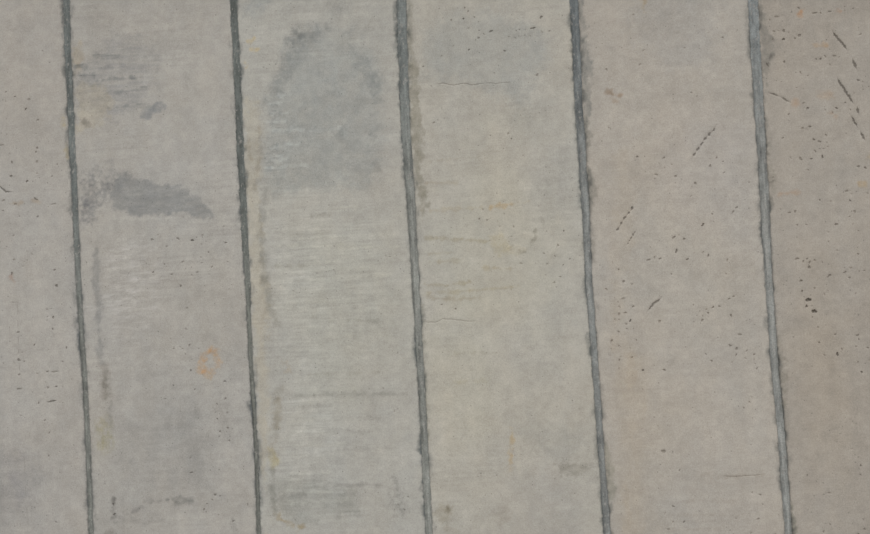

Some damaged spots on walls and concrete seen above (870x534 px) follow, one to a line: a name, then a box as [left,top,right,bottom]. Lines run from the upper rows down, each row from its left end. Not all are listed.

leakage [72,0,596,534]
leakage [609,0,744,88]